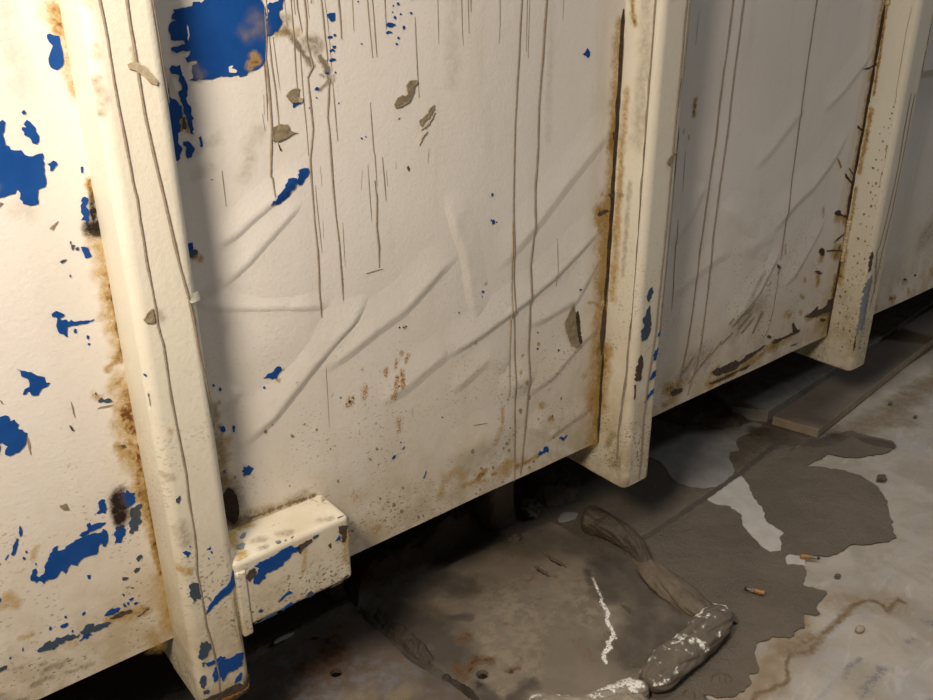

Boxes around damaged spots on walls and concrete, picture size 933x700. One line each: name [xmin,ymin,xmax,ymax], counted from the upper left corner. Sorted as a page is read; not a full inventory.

rust [47,2,69,65]
peeling [165,0,283,161]
peeling [0,110,57,206]
peeling [271,168,309,205]
rust [94,241,123,372]
rust [588,89,628,441]
rust [705,343,778,388]
peeling [0,415,27,456]
peeling [5,487,142,583]
rust [106,377,172,630]
peeling [246,534,319,585]
water stain [726,593,906,700]